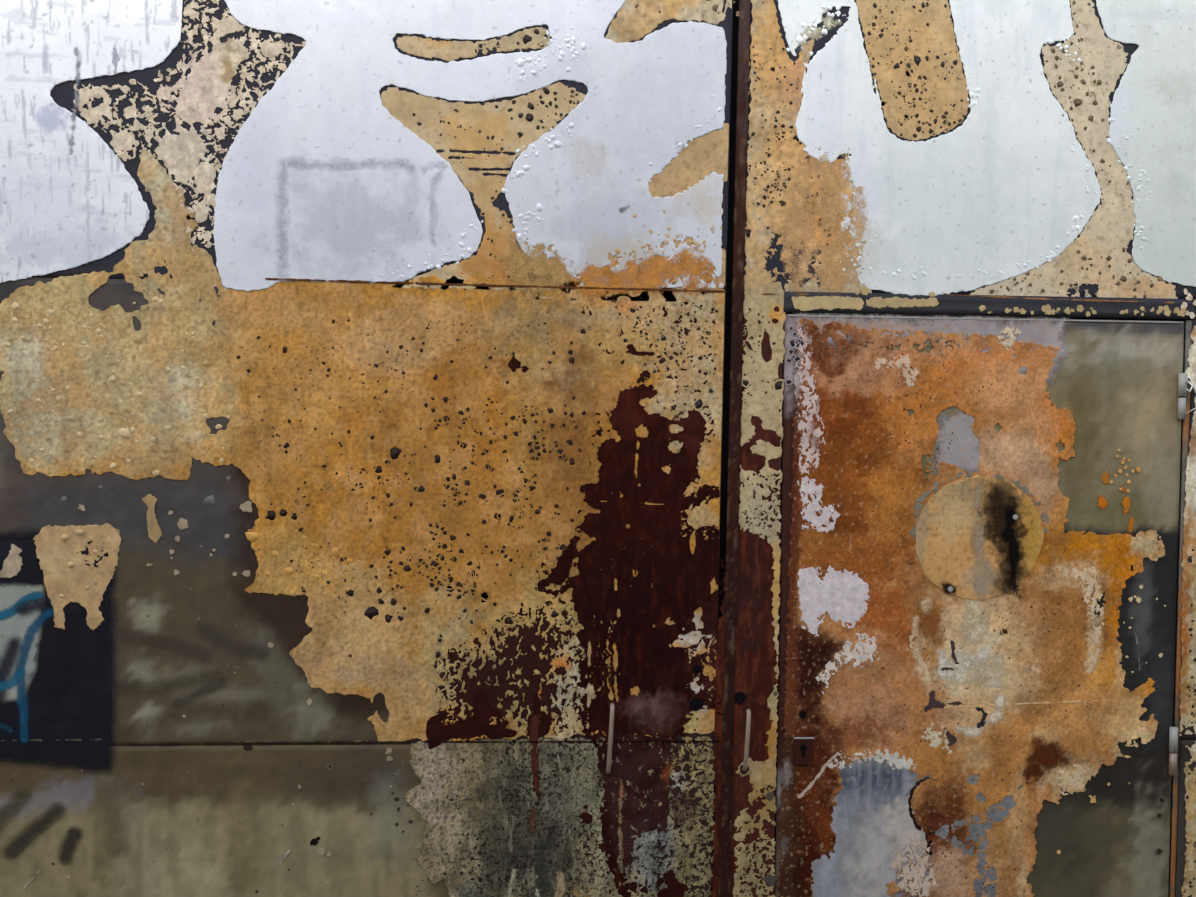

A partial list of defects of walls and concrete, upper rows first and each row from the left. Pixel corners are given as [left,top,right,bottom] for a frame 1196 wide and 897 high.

peeling [0,0,732,897]
corrosion [416,715,615,897]
corrosion [739,308,1165,897]
peeling [730,0,1196,897]